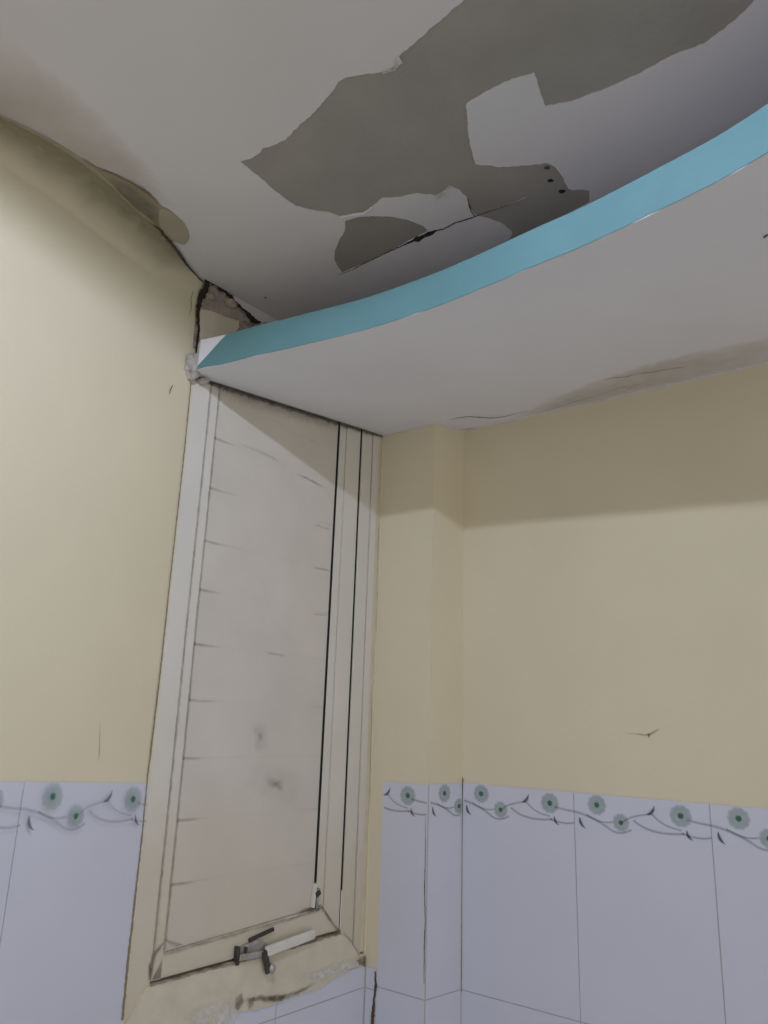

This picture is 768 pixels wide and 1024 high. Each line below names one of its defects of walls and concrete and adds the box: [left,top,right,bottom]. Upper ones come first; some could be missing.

peeling [241,0,754,272]
crack [153,225,204,314]
crack [339,199,509,275]
crack [370,972,378,1024]